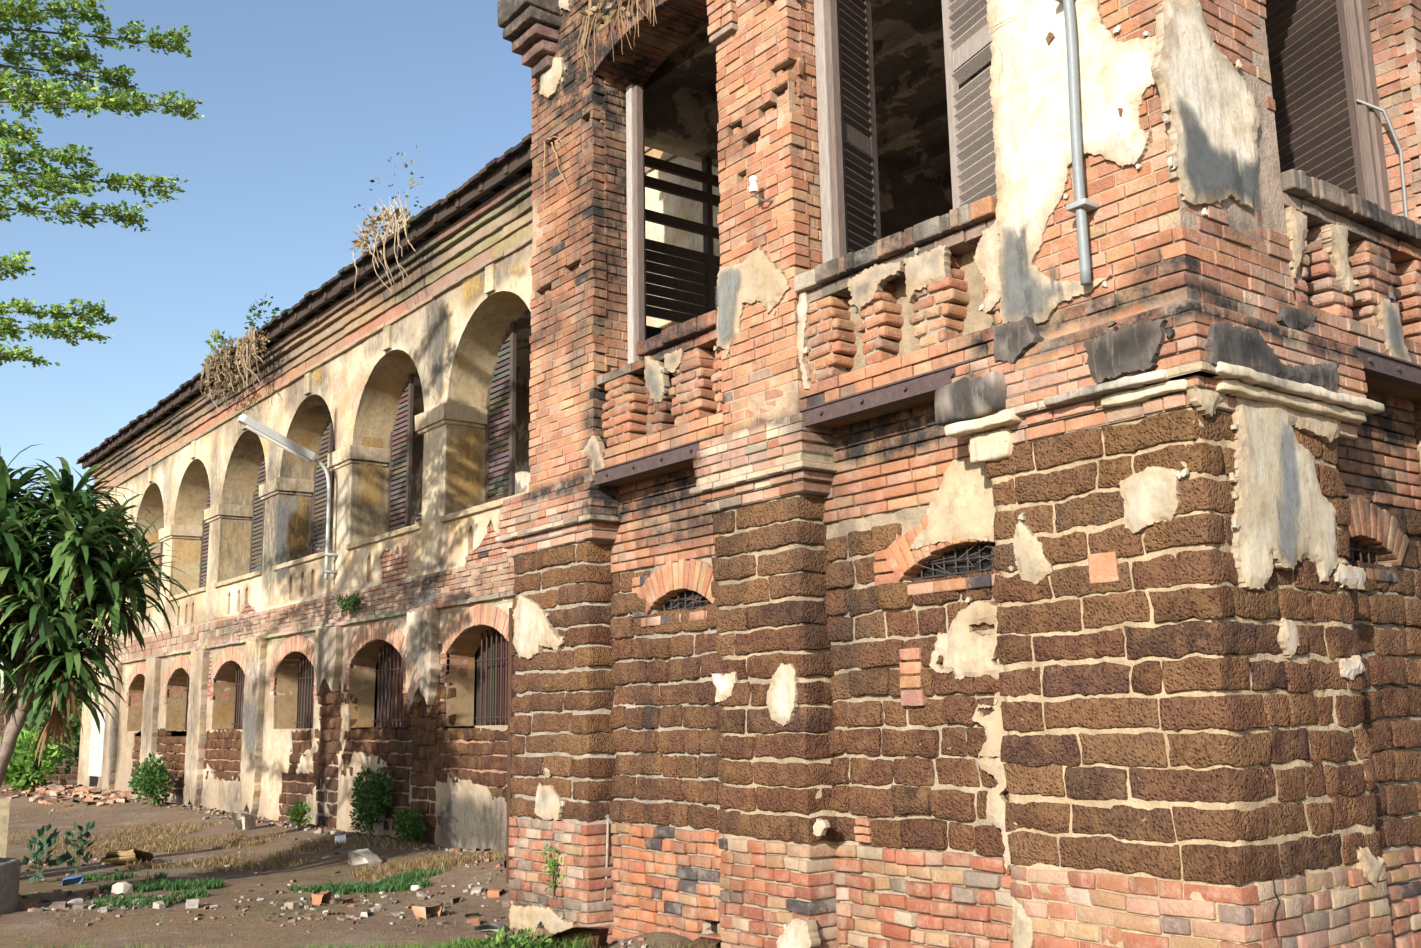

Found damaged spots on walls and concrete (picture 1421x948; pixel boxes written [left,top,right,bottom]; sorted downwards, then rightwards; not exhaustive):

peeling [979,0,1260,324]
water stain [1180,99,1260,223]
water stain [1002,228,1060,315]
water stain [1277,423,1299,560]
peeling [929,597,1014,871]
water stain [440,795,498,840]